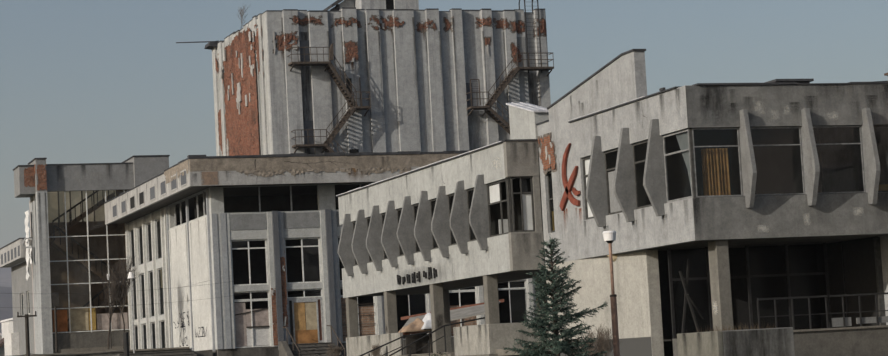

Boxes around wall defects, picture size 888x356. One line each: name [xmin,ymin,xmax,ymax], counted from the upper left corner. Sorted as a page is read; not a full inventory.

spalling [415,16,454,33]
spalling [475,16,547,63]
spalling [215,15,405,156]
spalling [538,132,557,175]
spalling [24,164,47,190]